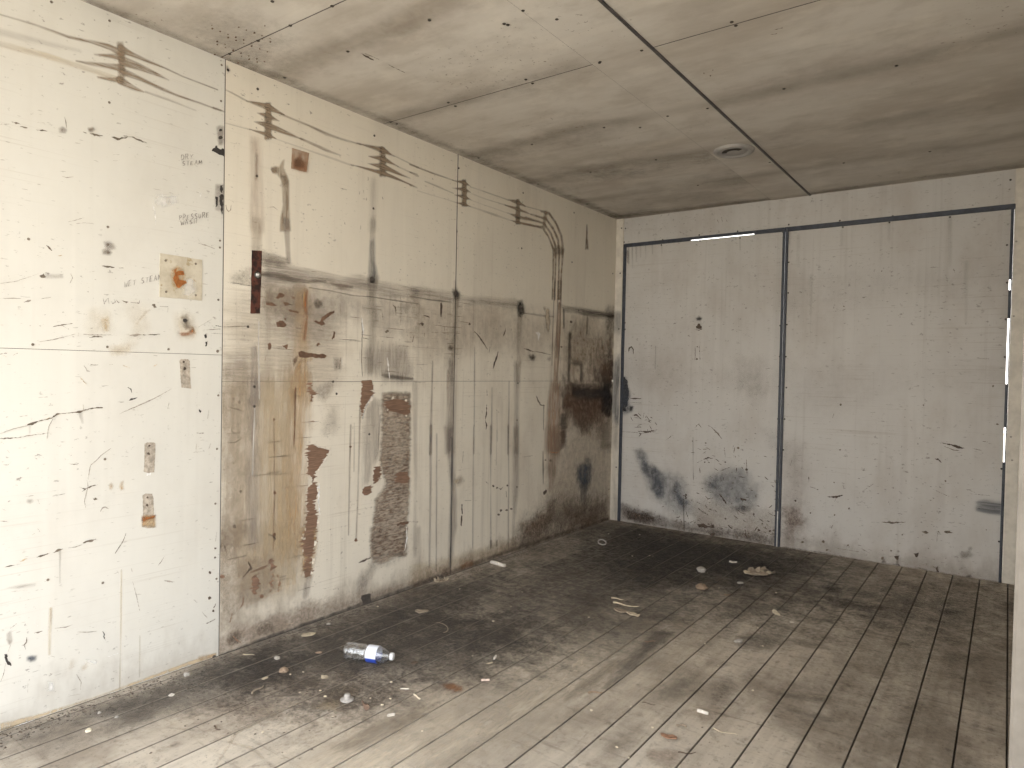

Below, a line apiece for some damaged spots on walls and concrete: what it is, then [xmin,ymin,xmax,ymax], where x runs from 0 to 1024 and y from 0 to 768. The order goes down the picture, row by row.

corrosion [172,268,187,288]
water stain [506,200,629,444]
peeling [359,378,414,563]